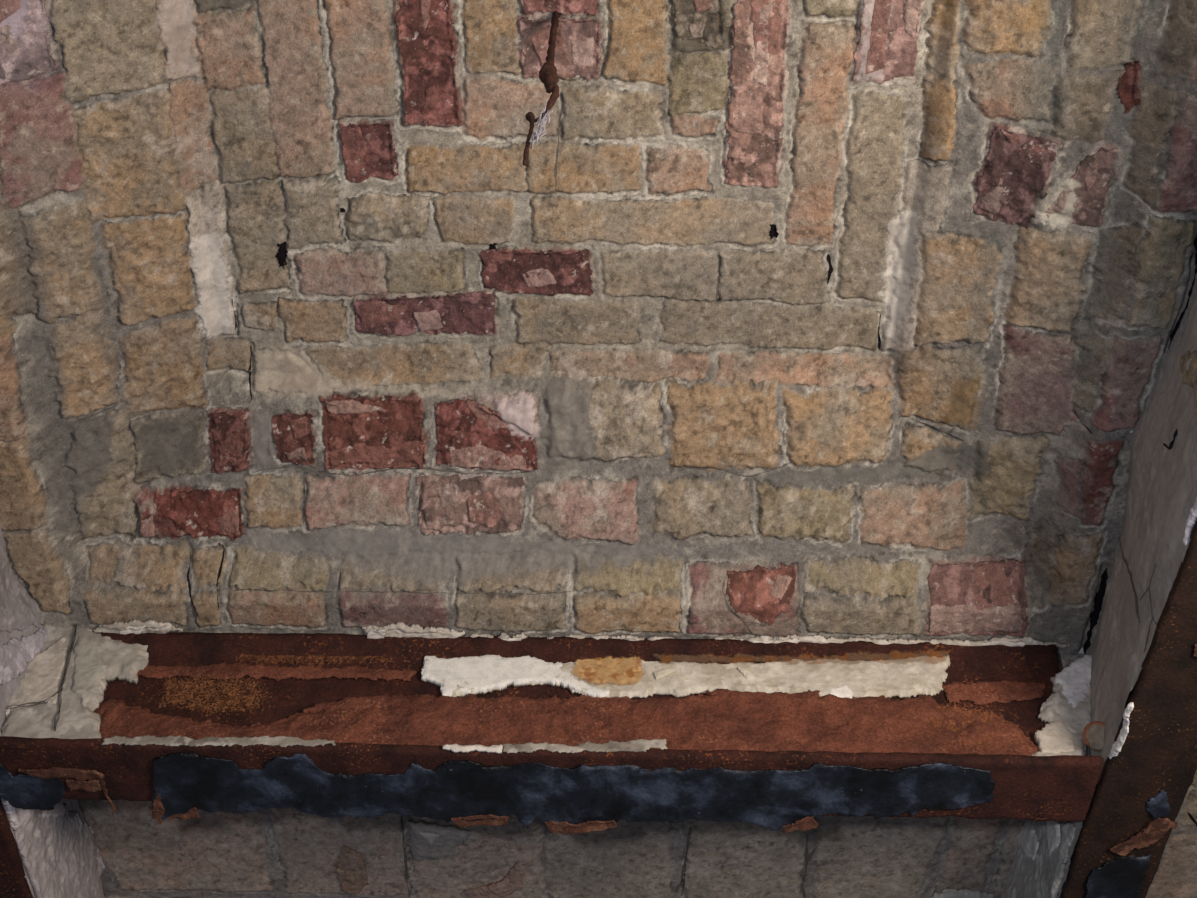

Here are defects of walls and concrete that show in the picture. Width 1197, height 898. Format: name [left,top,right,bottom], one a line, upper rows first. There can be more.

crack [1168,237,1197,383]
crack [1083,537,1157,654]
corrosion [159,674,272,716]
corrosion [235,654,394,667]
corrosion [572,656,643,685]
spalling [1108,702,1134,759]
flaking render [0,763,116,898]
spalling [335,845,368,896]
peeling [152,752,995,861]
flaking render [929,820,1076,898]
peeling [1084,790,1178,898]